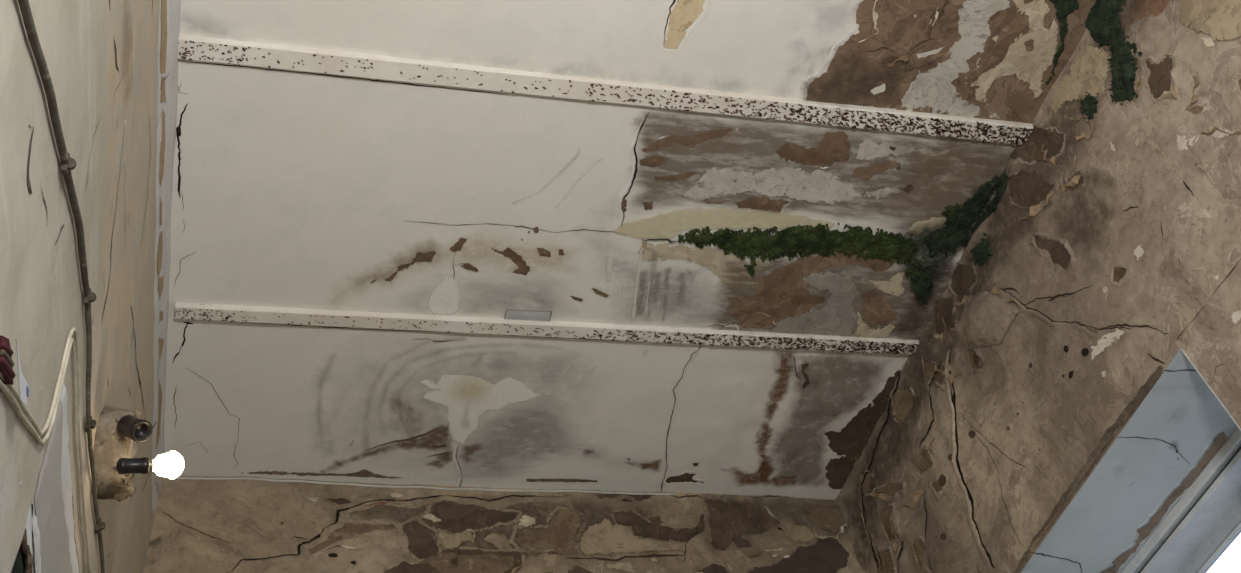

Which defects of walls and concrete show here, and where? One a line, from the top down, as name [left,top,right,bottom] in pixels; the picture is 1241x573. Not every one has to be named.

peeling [157,0,167,321]
peeling [774,126,905,181]
peeling [797,0,1112,276]
peeling [721,251,900,329]
water stain [606,94,1083,564]
crack [992,284,1223,375]
crack [227,443,569,573]
water stain [336,374,560,466]
spalling [282,498,636,573]
crack [660,345,820,502]
spalling [526,356,954,573]
crack [943,345,1082,573]